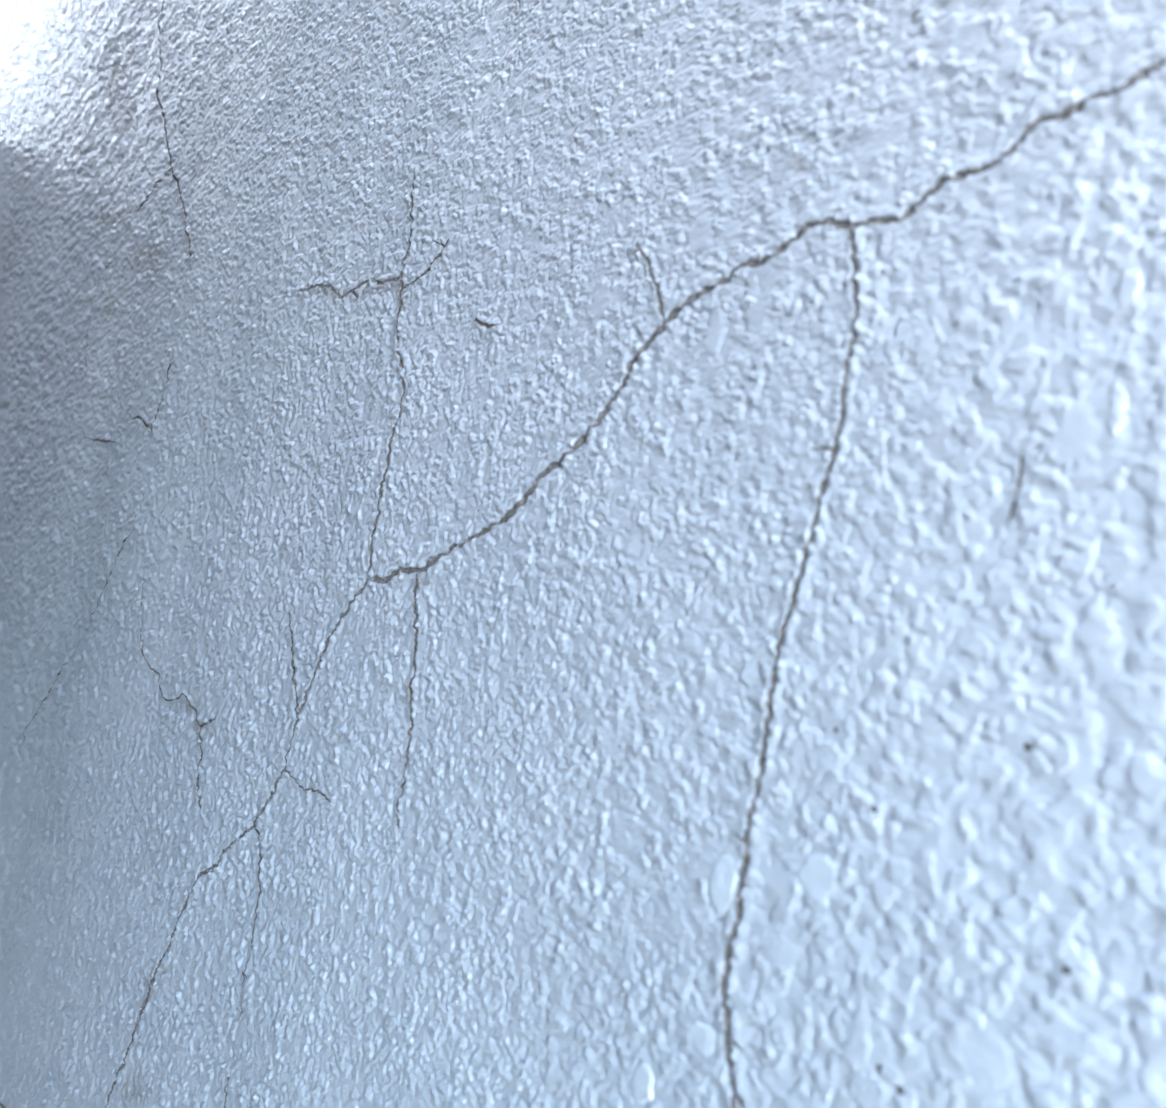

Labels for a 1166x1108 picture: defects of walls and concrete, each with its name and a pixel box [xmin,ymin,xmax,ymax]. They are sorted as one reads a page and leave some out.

crack [81,350,174,443]
crack [84,0,192,370]
crack [296,175,452,372]
crack [367,60,1166,670]
crack [20,528,134,749]
crack [116,574,369,1076]
crack [396,674,415,813]
crack [719,228,859,1108]
crack [105,1080,117,1108]